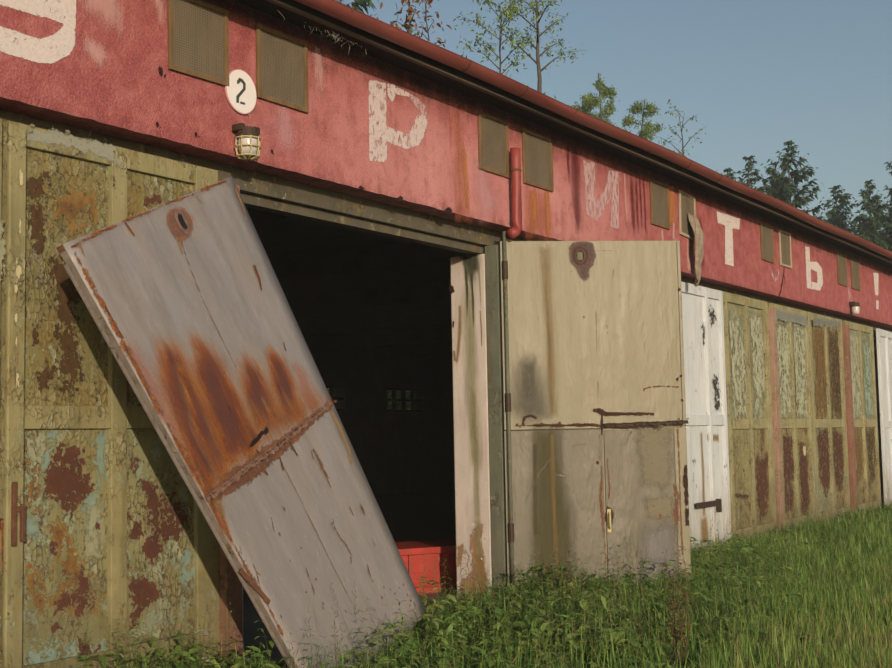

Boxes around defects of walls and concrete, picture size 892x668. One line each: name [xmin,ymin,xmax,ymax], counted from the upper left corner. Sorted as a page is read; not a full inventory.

peeling [0,218,22,293]
peeling [18,169,107,399]
peeling [22,429,109,665]
peeling [26,124,124,165]
peeling [142,188,162,206]
peeling [127,477,195,640]
rust [71,180,352,636]
rust [569,241,596,281]
rust [516,408,689,583]
peeling [701,305,765,419]
peeling [736,453,769,522]
peeling [773,307,876,516]